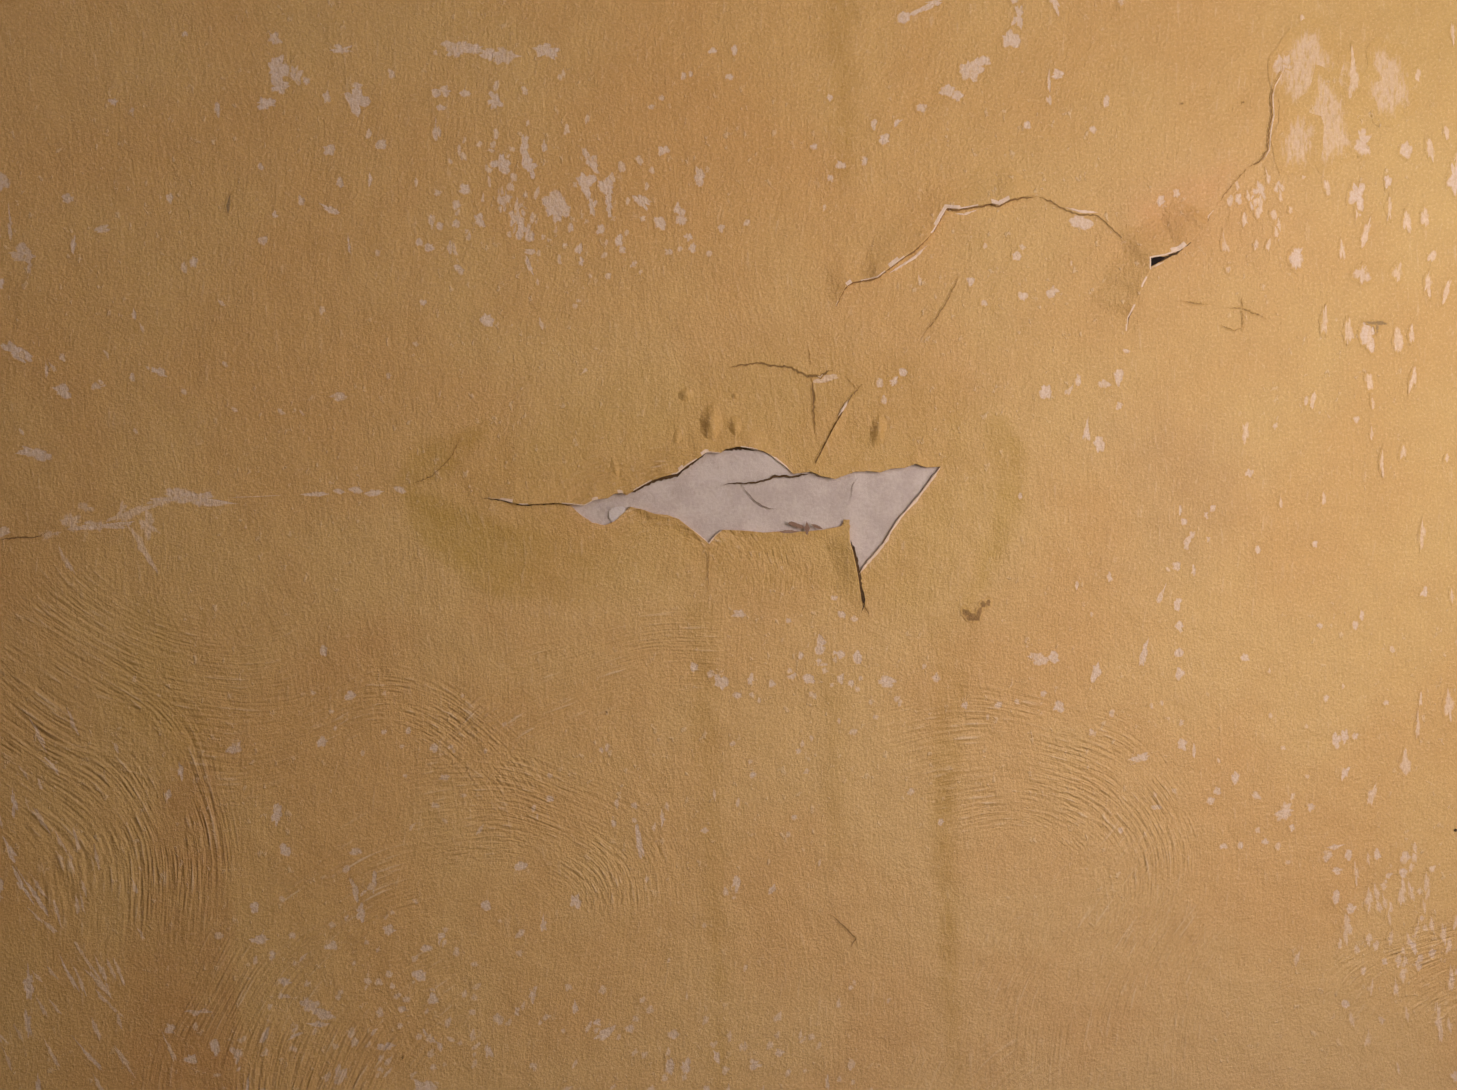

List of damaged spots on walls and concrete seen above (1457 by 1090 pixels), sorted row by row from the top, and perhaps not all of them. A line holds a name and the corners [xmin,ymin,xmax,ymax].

crack [826,60,1284,338]
crack [730,348,862,464]
crack [0,438,460,577]
peeling [485,423,941,624]
peeling [688,632,904,738]